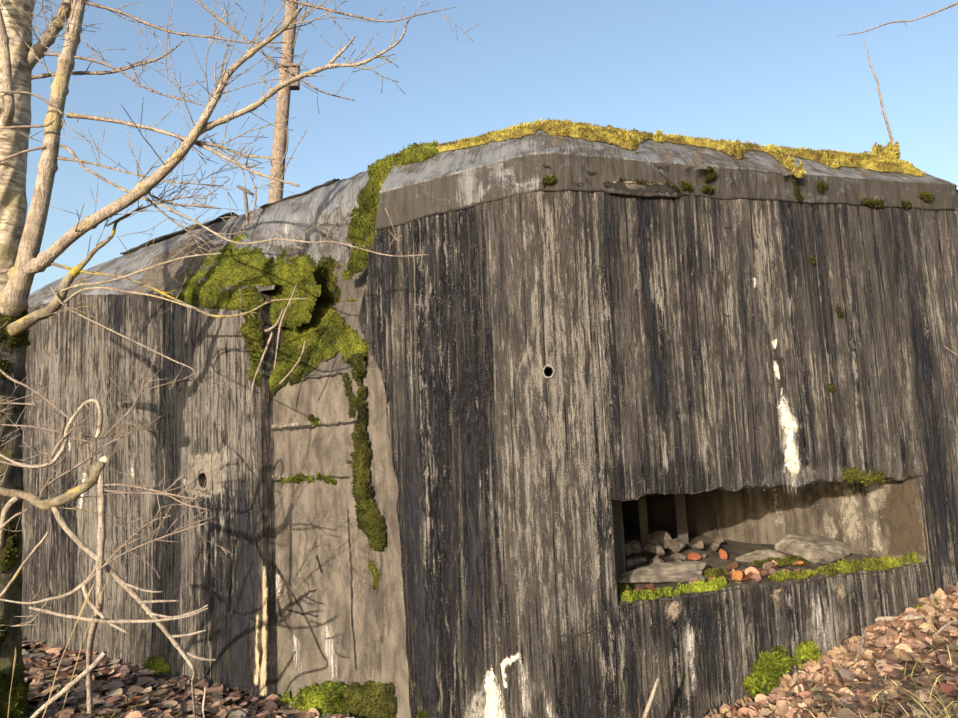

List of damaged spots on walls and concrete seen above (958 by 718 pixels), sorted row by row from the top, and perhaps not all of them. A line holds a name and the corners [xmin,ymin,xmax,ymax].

damp [773,361,801,490]
damp [822,478,890,551]